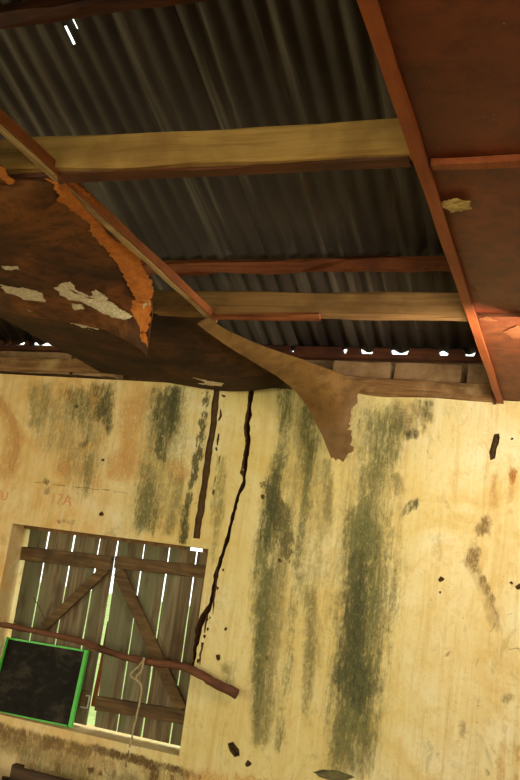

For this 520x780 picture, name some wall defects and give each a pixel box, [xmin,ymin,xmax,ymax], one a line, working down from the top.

peeling [1,284,46,302]
peeling [54,282,132,320]
damp [135,464,157,533]
damp [149,387,180,462]
damp [166,391,210,544]
crack [192,391,254,666]
damp [253,386,318,741]
damp [330,409,402,770]